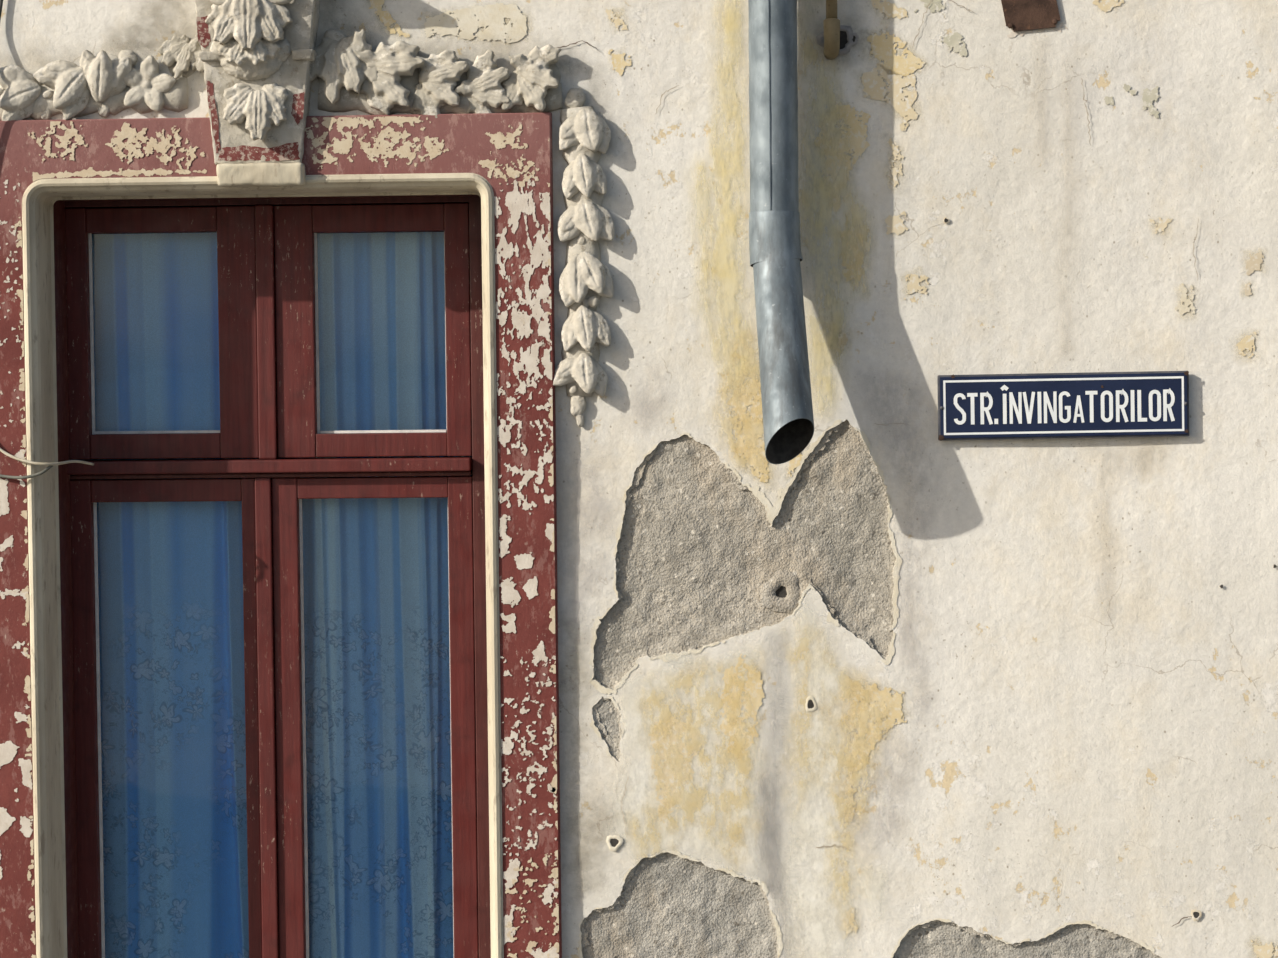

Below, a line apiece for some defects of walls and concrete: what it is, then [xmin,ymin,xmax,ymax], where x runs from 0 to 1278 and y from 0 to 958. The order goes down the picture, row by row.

peeling [424,3,527,43]
peeling [0,121,207,202]
peeling [305,116,449,169]
peeling [839,0,945,187]
peeling [0,217,28,571]
peeling [0,586,29,626]
peeling [12,641,30,658]
peeling [478,124,559,958]
flaking render [589,379,902,762]
peeling [0,675,36,958]
flaking render [578,848,783,958]
flaking render [891,918,1162,958]